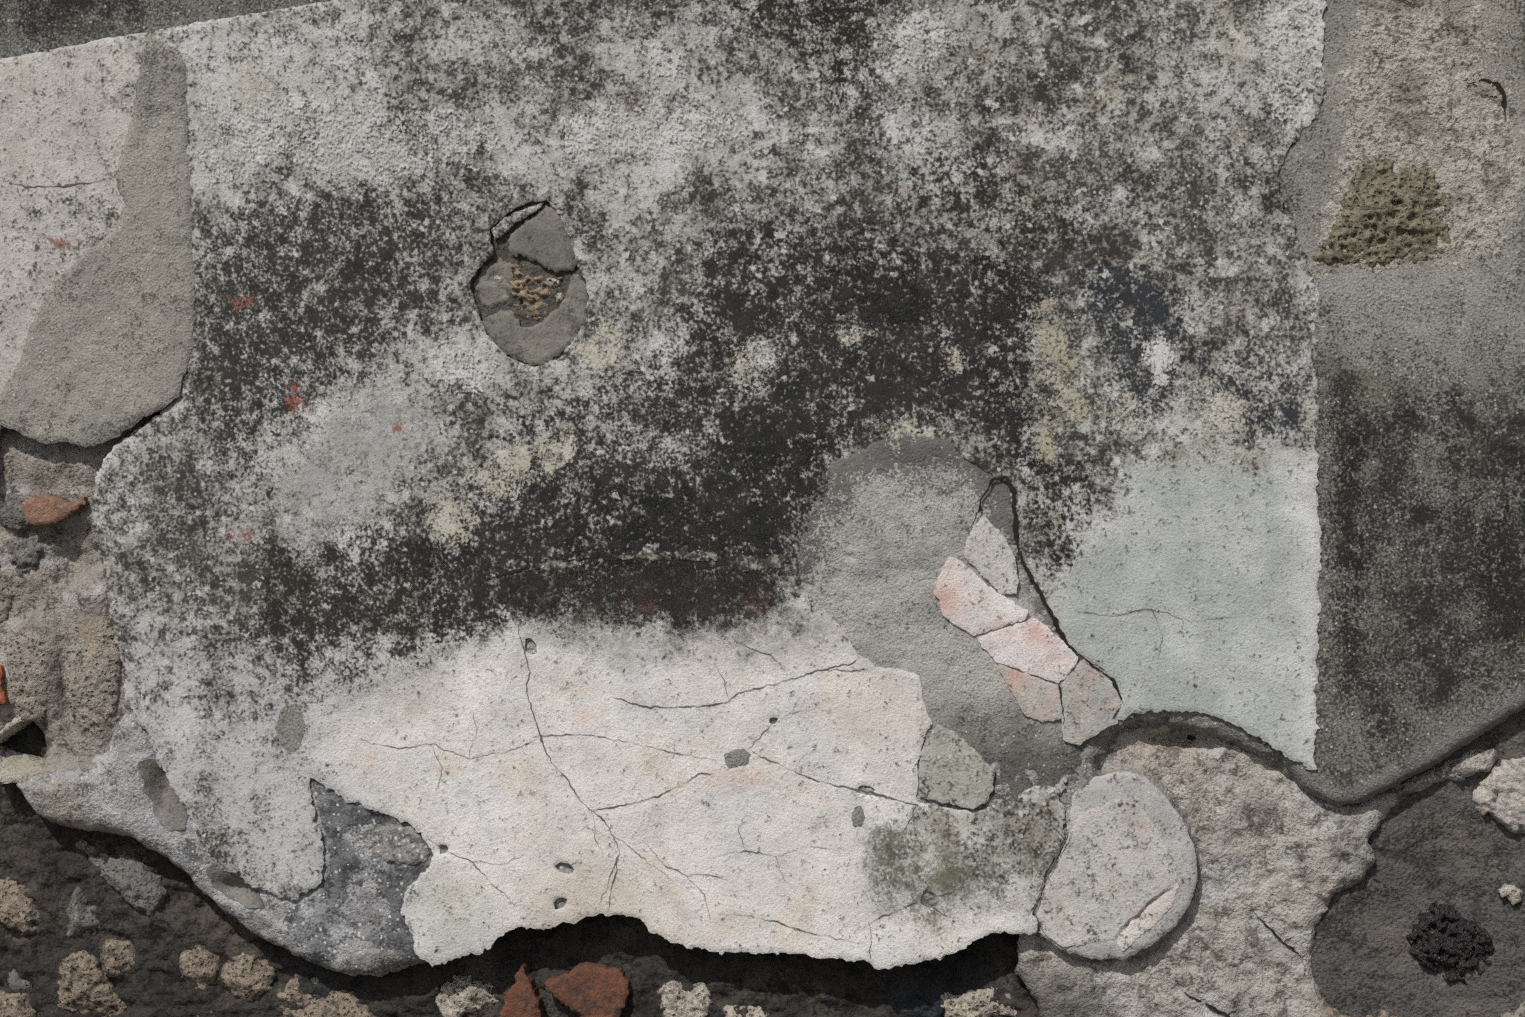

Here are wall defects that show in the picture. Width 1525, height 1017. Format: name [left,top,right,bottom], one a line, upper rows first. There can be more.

water stain [186,91,501,500]
spalling [471,201,589,367]
water stain [244,126,1525,749]
spalling [138,759,188,831]
spalling [205,866,264,908]
spalling [279,778,433,975]
crack [362,627,970,963]
crack [1033,812,1068,928]